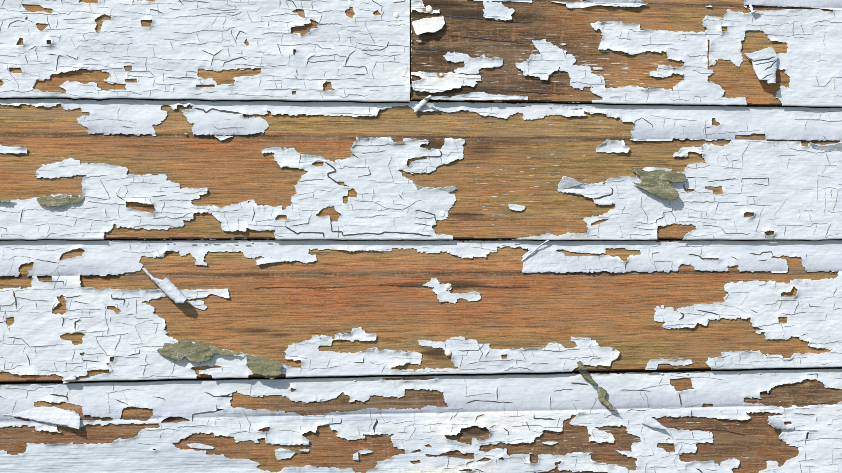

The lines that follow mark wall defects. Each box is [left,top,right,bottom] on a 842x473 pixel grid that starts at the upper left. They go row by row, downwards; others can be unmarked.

peeling [0,0,842,240]
crack [0,0,842,270]
crack [0,137,484,420]
peeling [80,240,838,411]
crack [657,280,842,380]
peeling [0,401,190,455]
crack [134,382,262,445]
peeling [217,388,448,416]
peeling [172,413,641,473]
crack [281,334,744,473]
peeling [642,379,842,473]
crack [758,408,842,473]